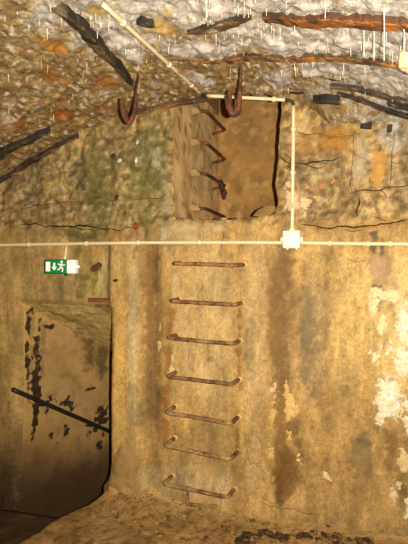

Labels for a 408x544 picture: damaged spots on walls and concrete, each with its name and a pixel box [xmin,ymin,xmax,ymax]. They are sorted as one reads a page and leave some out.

leakage [200,0,408,21]
efflorescence [103,29,147,65]
efflorescence [161,30,408,60]
efflorescence [189,69,220,89]
efflorescence [298,63,408,94]
efflorescence [152,150,162,167]
crack [280,129,408,232]
crack [20,223,132,231]
spalling [367,255,404,336]
leakage [300,298,315,381]
leakage [274,377,301,503]